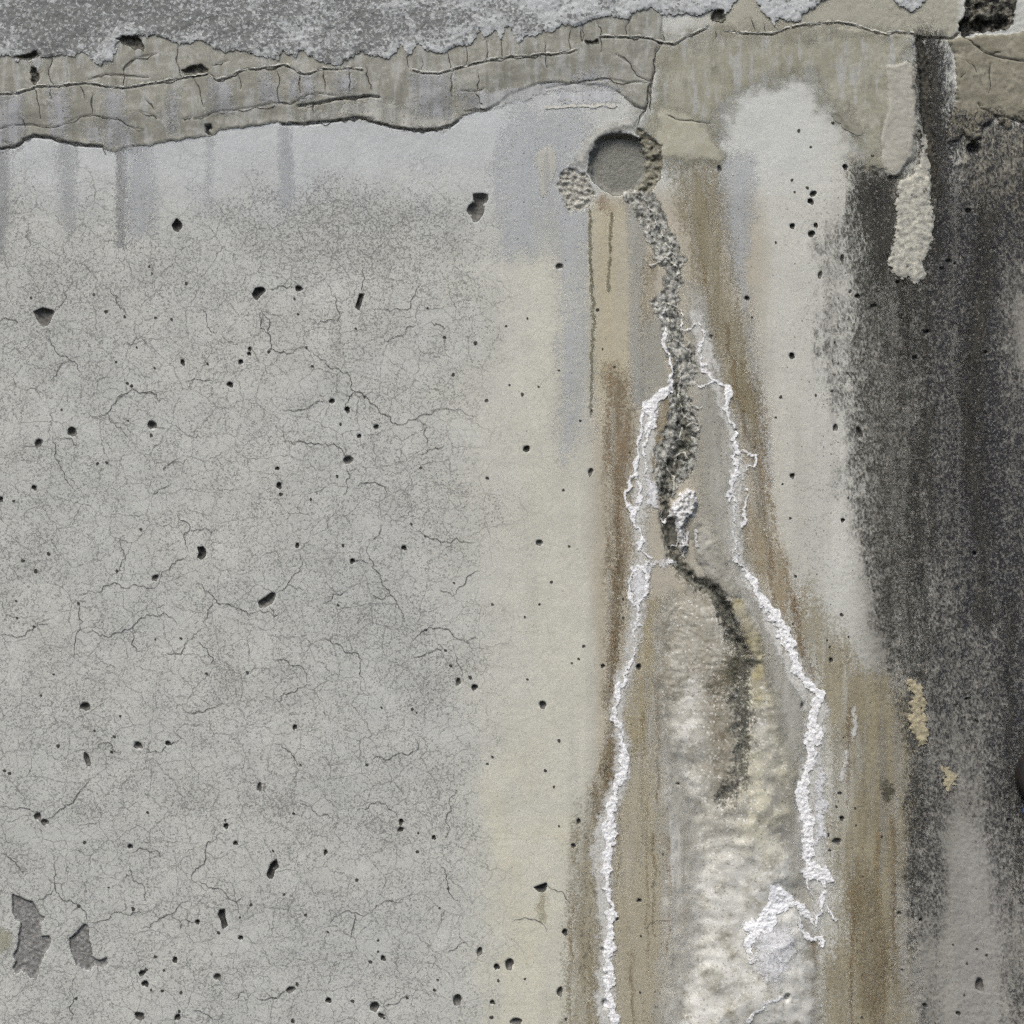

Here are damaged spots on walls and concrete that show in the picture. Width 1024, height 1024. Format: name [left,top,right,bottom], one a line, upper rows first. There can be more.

peeling [0,6,920,181]
crack [0,16,1024,154]
spalling [557,167,596,212]
crack [90,388,166,437]
crack [259,285,477,495]
crack [74,517,303,663]
crack [355,527,476,673]
water stain [589,203,837,1024]
water stain [814,28,1024,1024]
peeling [12,893,51,978]
peeling [69,924,108,971]
crack [38,832,243,928]